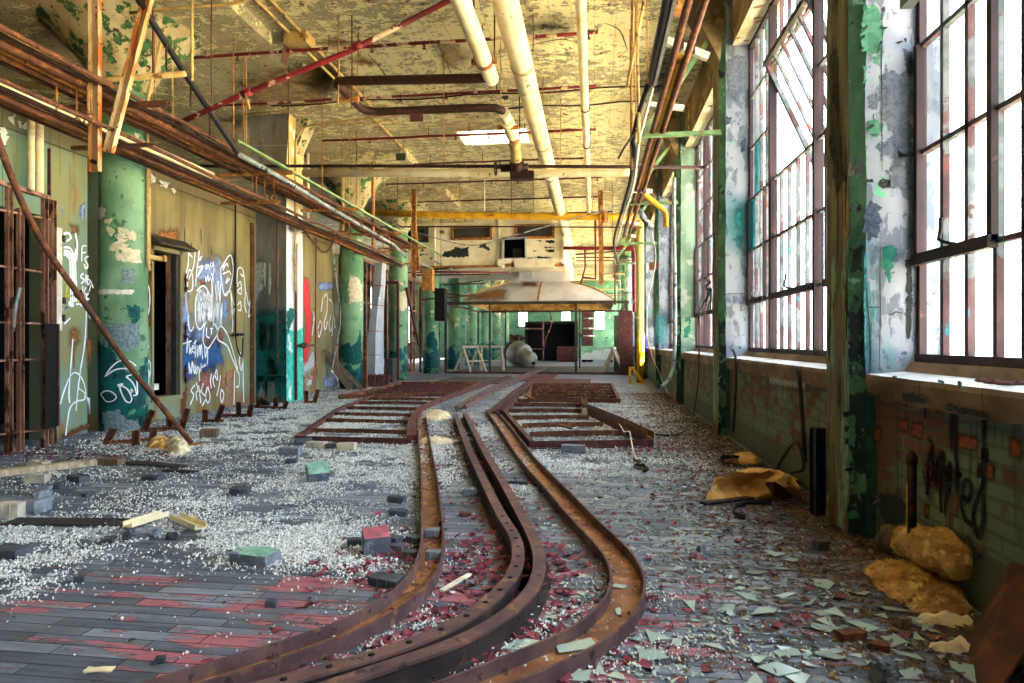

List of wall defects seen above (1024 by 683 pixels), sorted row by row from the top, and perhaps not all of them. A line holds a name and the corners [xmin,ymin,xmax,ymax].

spalling [726,55,747,99]
peeling [151,0,659,239]
spalling [842,4,913,283]
peeling [116,155,176,194]
rust [157,230,178,240]
peeling [96,207,142,381]
peeling [348,275,363,304]
peeling [341,330,362,365]
peeling [426,331,438,352]
spalling [847,290,863,356]
spalling [872,491,906,528]
spalling [949,495,983,562]